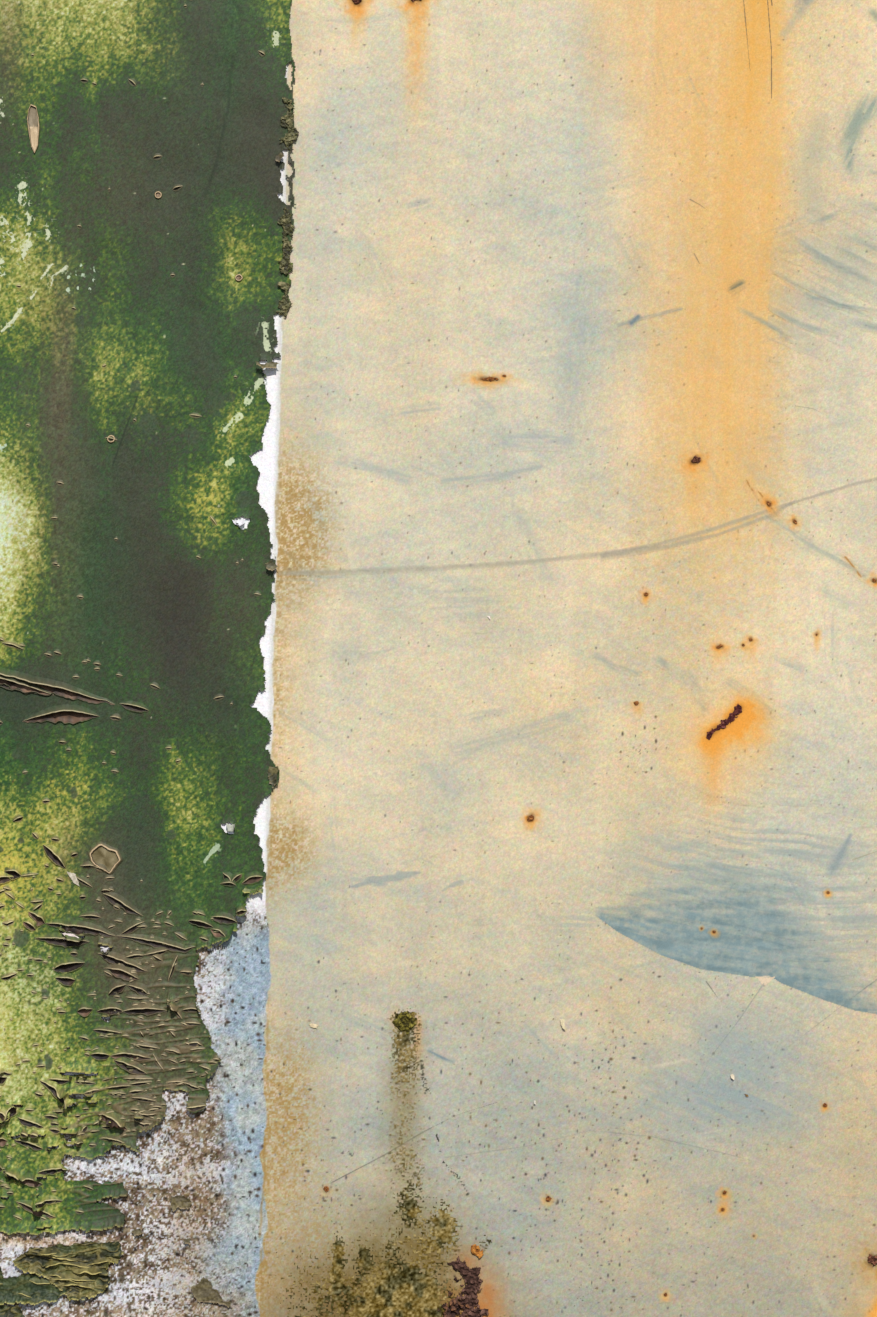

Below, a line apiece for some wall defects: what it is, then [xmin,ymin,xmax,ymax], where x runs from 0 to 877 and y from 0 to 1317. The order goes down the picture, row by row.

corrosion [334,0,447,133]
peeling [276,149,287,204]
corrosion [450,369,526,393]
corrosion [839,550,877,590]
peeling [0,313,283,1317]
corrosion [517,801,546,836]
water stain [260,1018,567,1317]
corrosion [713,1185,735,1226]
corrosion [437,1244,489,1317]
corrosion [829,1228,877,1317]